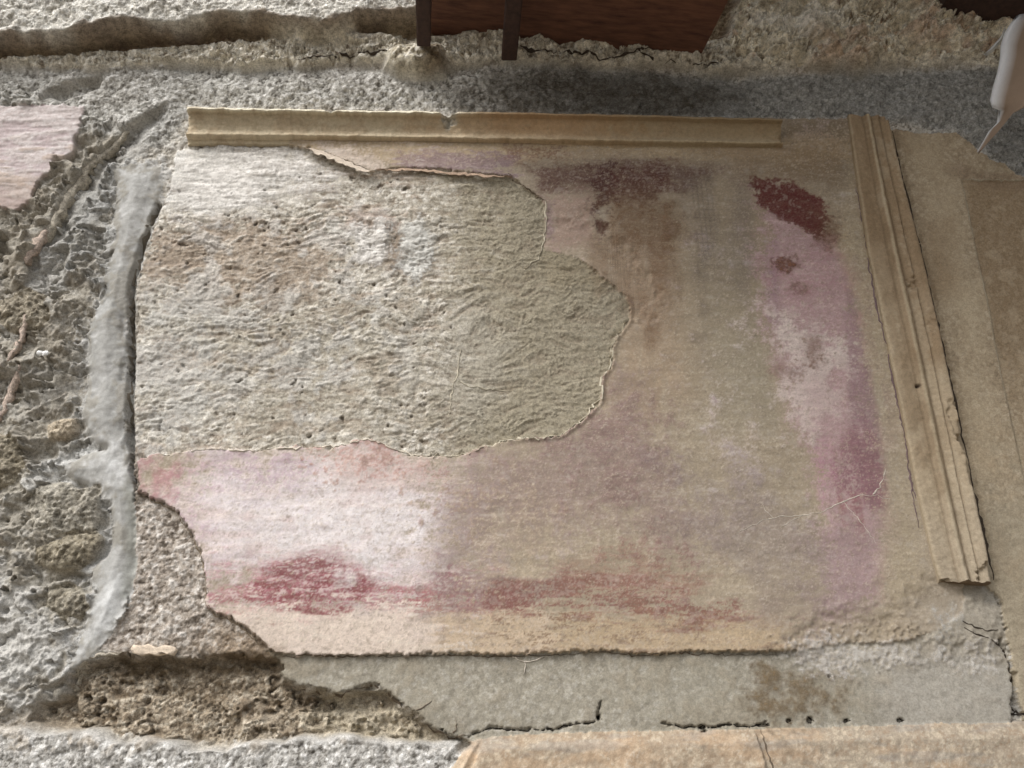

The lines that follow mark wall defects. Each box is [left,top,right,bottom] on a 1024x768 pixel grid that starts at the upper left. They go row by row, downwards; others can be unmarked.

spalling [30,144,631,746]
crack [962,620,1024,716]